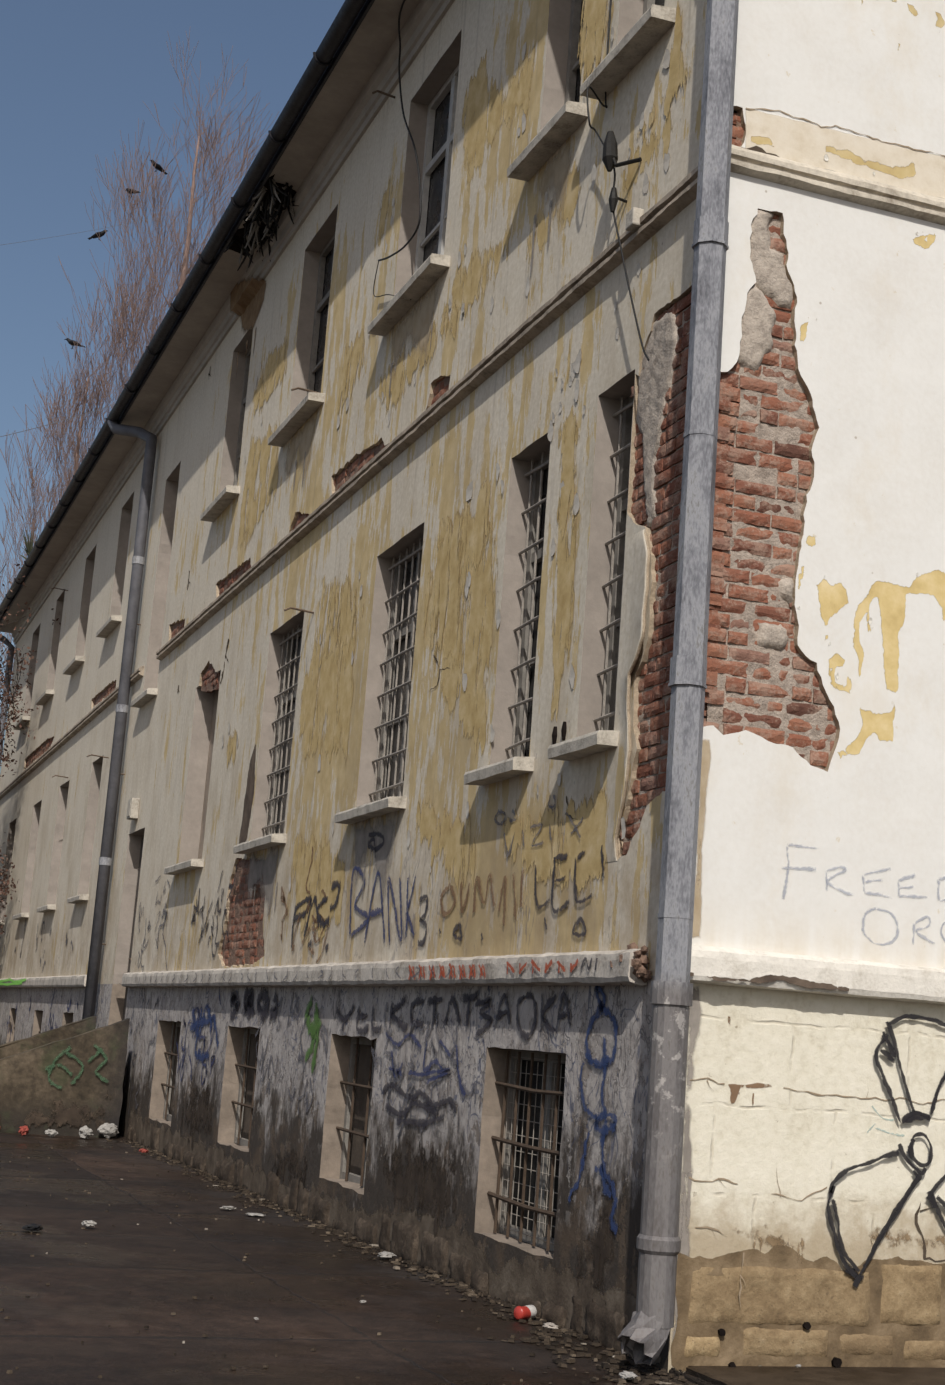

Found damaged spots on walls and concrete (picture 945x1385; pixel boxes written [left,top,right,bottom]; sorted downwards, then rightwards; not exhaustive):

peeling [577,0,614,83]
peeling [334,161,597,492]
peeling [219,338,287,596]
peeling [423,463,504,756]
flaking render [503,292,692,894]
flaking render [703,210,945,770]
flaking render [221,723,265,967]
peeling [289,820,348,940]
water stain [381,1133,457,1238]
water stain [576,1172,614,1305]
water stain [753,1236,804,1261]
water stain [871,1228,945,1246]